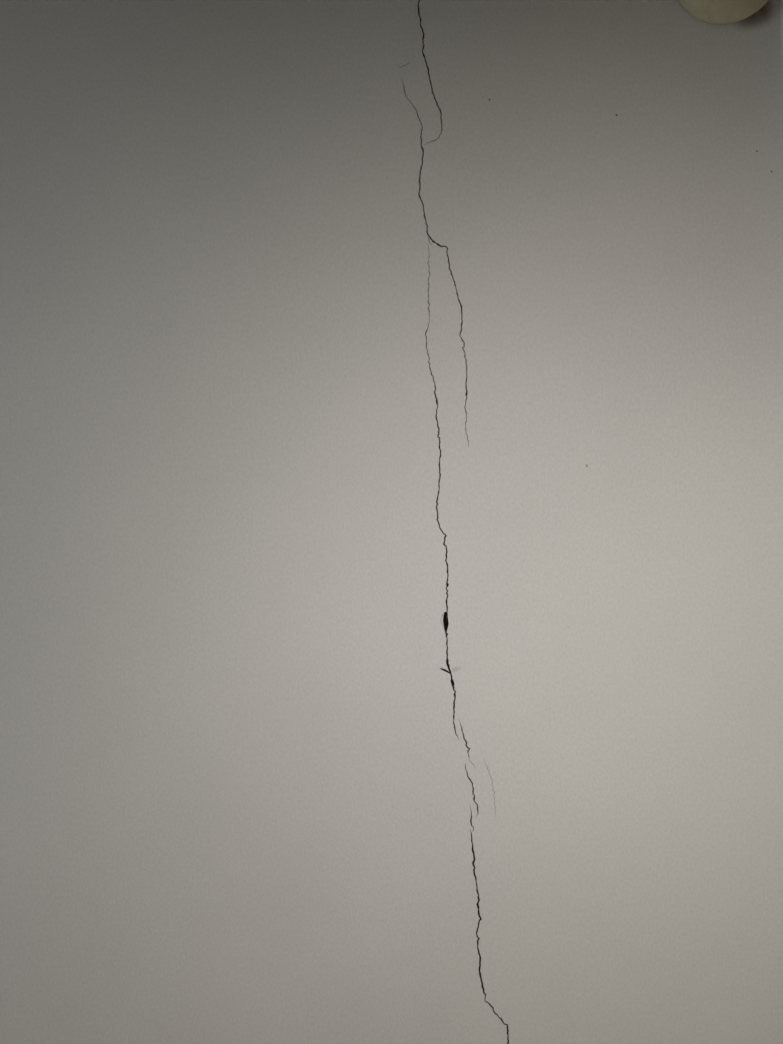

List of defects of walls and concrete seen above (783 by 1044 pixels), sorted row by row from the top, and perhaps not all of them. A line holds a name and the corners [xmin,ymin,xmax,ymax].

crack [399,0,509,1044]